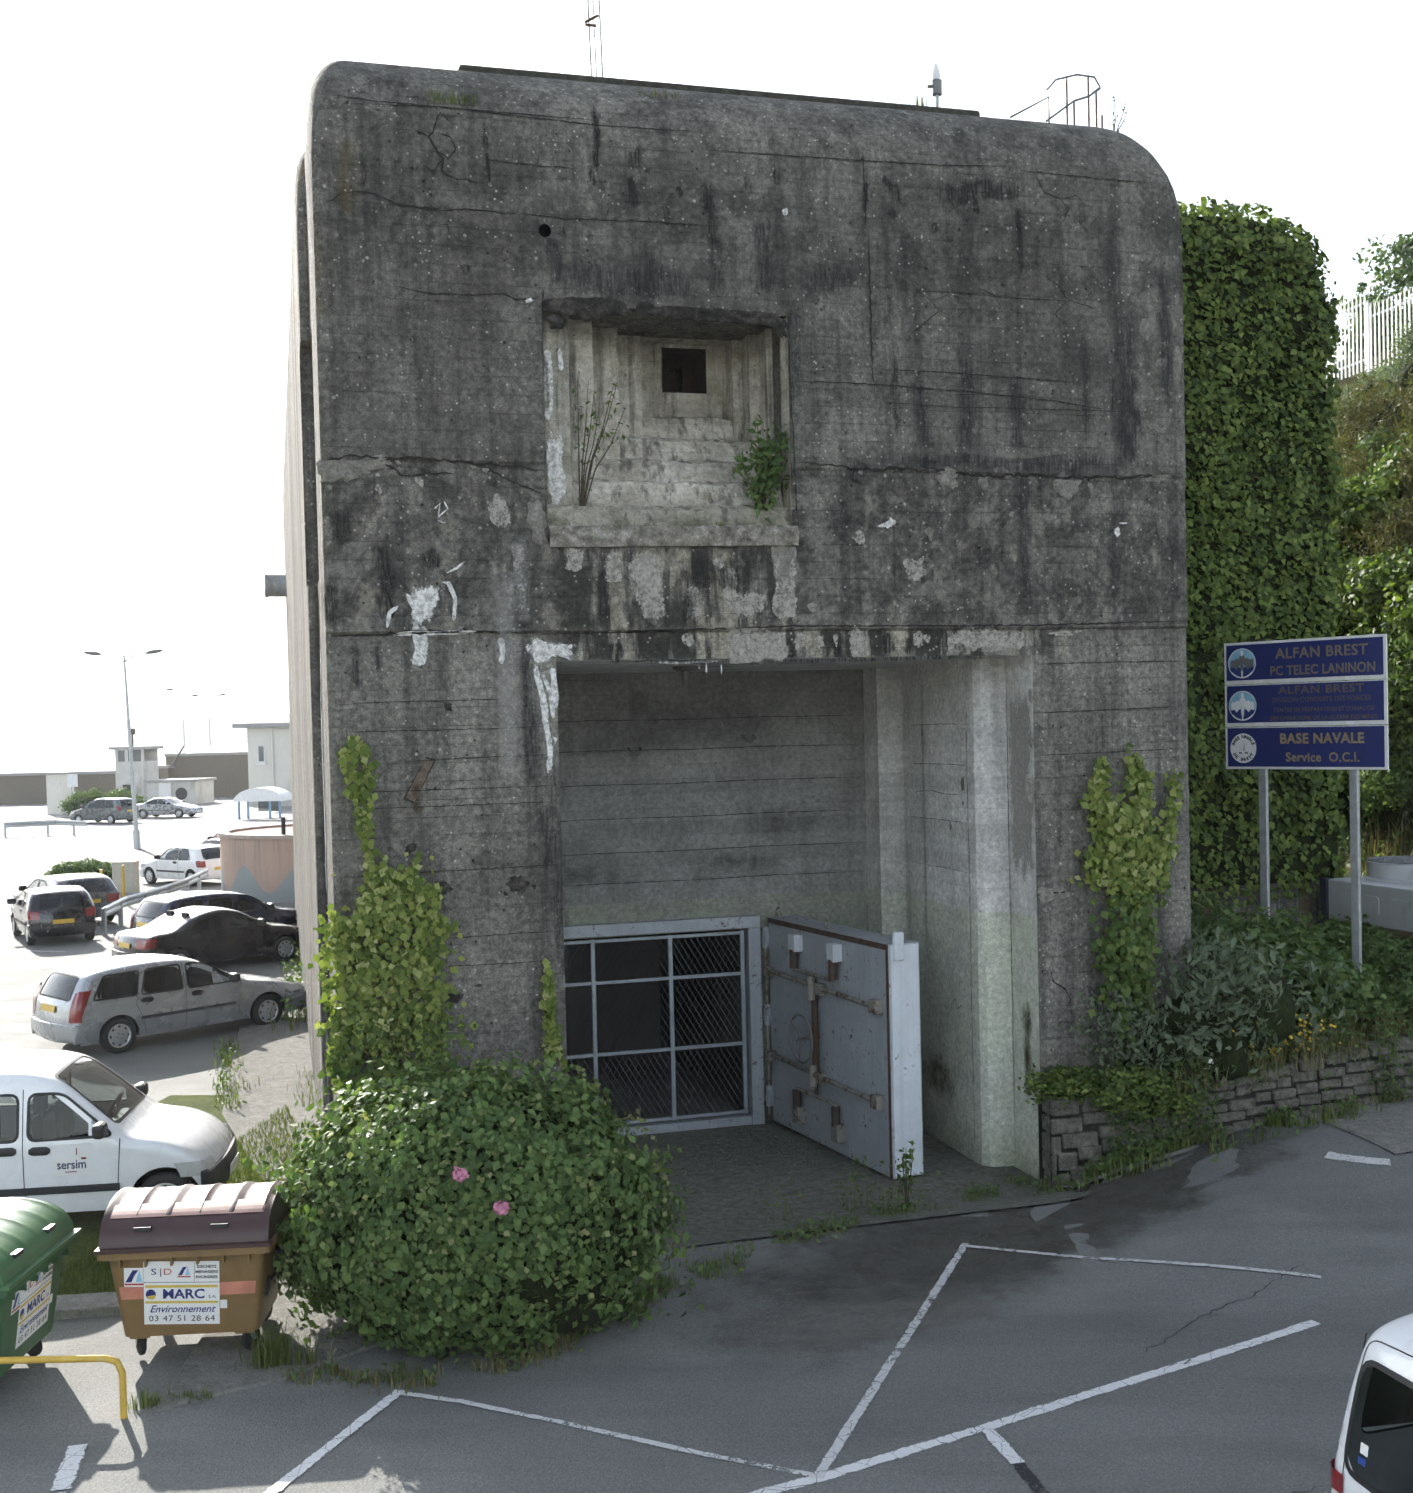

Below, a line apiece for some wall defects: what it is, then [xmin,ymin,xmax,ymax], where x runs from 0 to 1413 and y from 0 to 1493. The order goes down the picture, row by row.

crack [322,102,702,239]
damp [863,175,901,217]
damp [937,177,1023,264]
damp [1158,274,1171,397]
damp [892,319,1140,588]
damp [323,585,337,623]
damp [373,546,475,666]
damp [598,570,611,621]
damp [680,558,752,622]
damp [610,633,982,675]
damp [498,549,579,972]
rust [767,918,893,1179]